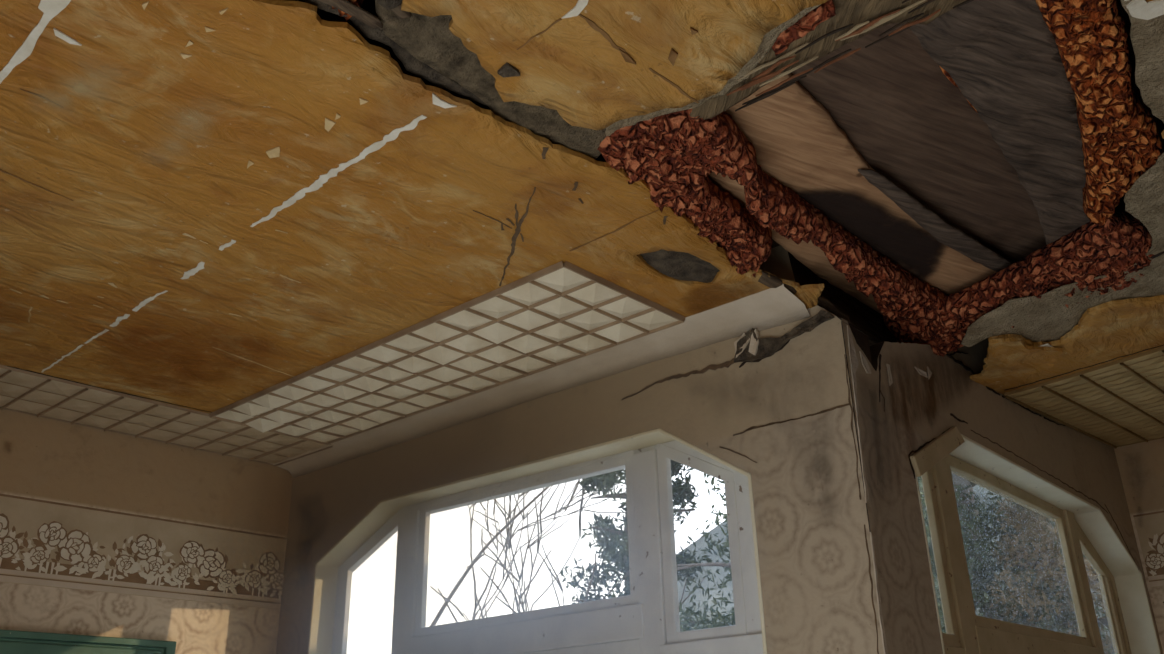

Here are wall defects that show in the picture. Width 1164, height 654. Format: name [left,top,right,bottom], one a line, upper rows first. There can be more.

peeling [0,0,82,84]
crack [303,0,606,160]
peeling [517,0,636,64]
peeling [605,4,821,136]
peeling [1121,0,1164,123]
peeling [250,113,427,233]
peeling [180,261,205,279]
crack [473,187,536,286]
flaking render [639,249,720,283]
peeling [961,152,1164,347]
peeling [41,290,212,413]
crack [622,340,790,400]